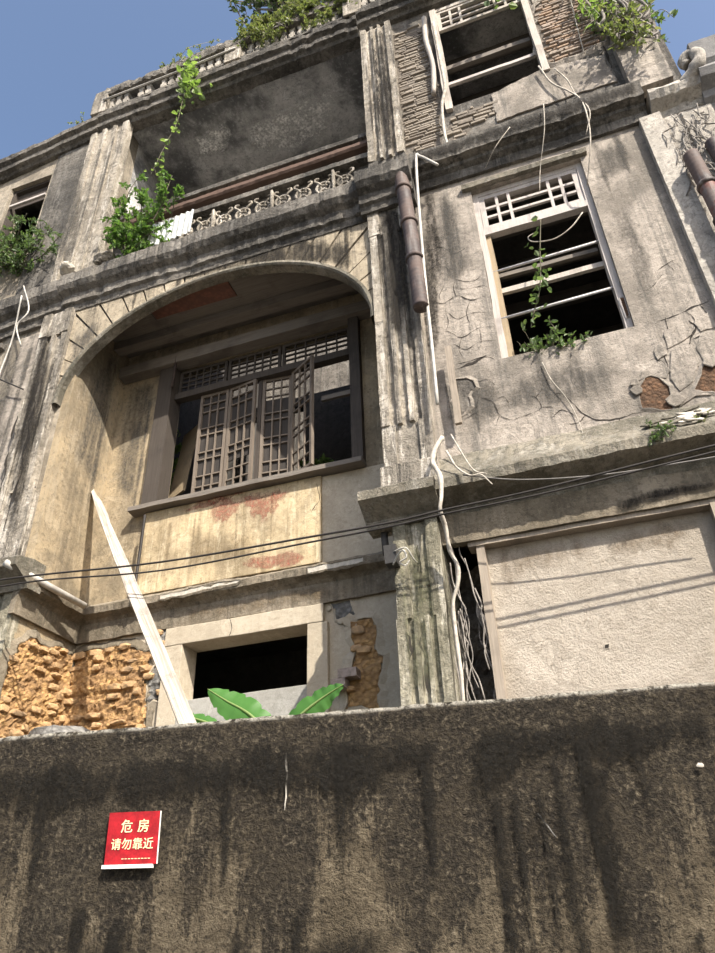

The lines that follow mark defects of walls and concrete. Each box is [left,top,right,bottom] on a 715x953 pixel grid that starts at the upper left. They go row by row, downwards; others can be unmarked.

flaking render [393,0,617,152]
crack [431,247,642,425]
flaking render [629,311,715,427]
spalling [0,629,161,727]
water stain [0,736,437,889]
water stain [474,714,708,953]
water stain [68,903,135,953]